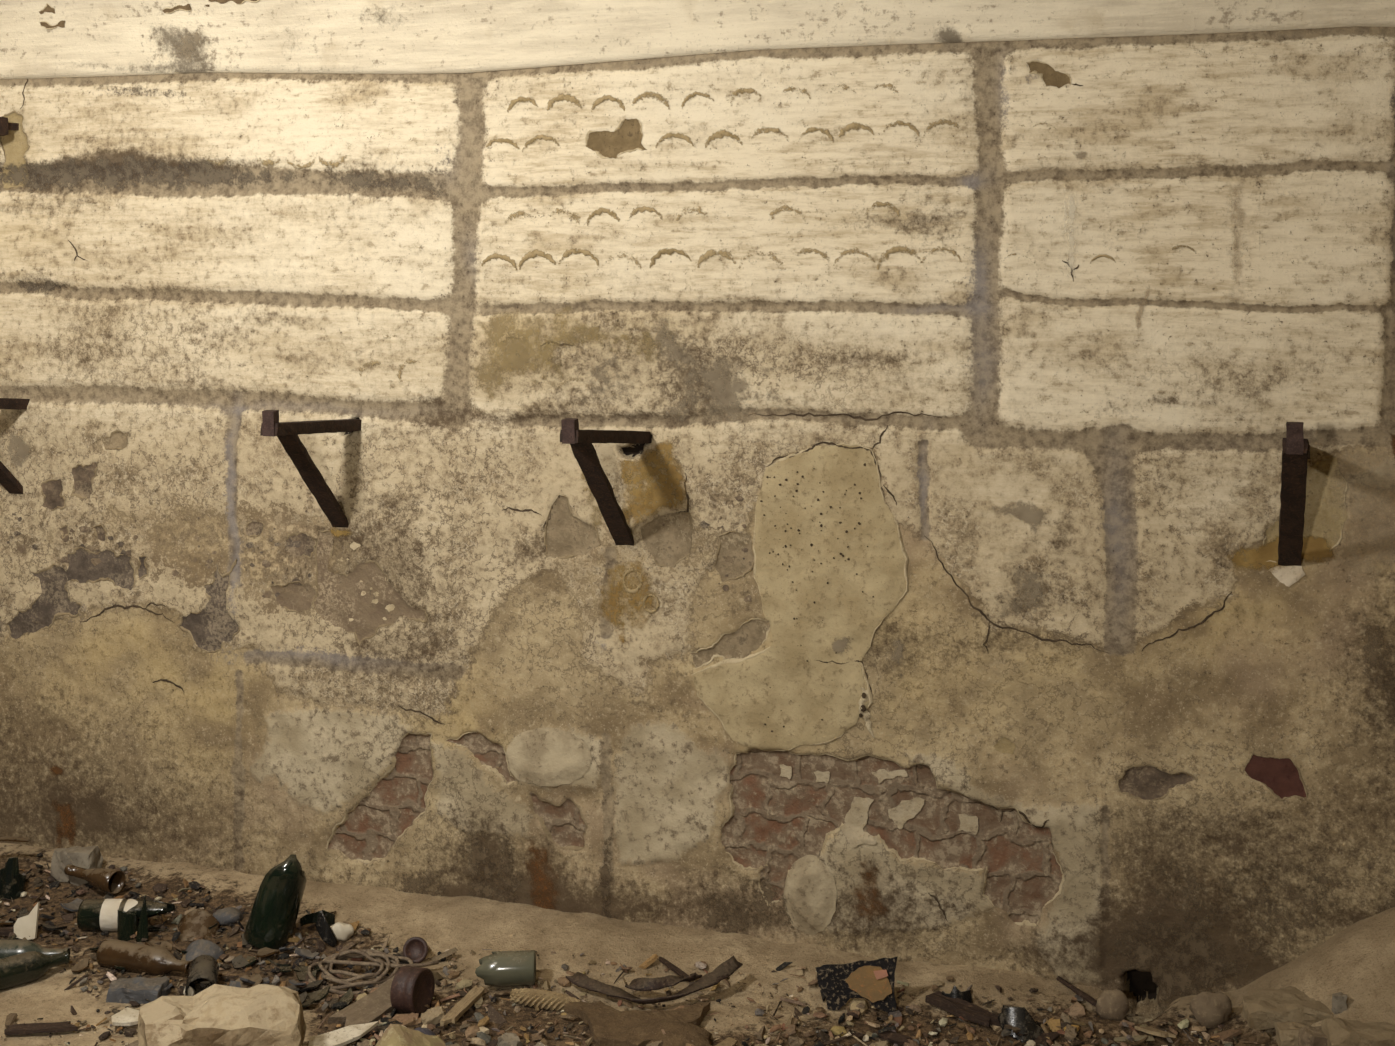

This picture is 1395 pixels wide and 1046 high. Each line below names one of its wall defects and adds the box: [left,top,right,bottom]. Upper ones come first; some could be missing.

peeling [162,0,259,14]
peeling [585,119,647,159]
damp [0,154,297,192]
damp [327,167,441,197]
crack [750,411,942,503]
peeling [0,430,149,639]
crack [925,536,1108,653]
crack [1142,592,1232,651]
spalling [641,443,1065,927]
flaking render [326,732,516,863]
peeling [1118,766,1197,800]
peeling [1244,753,1308,801]